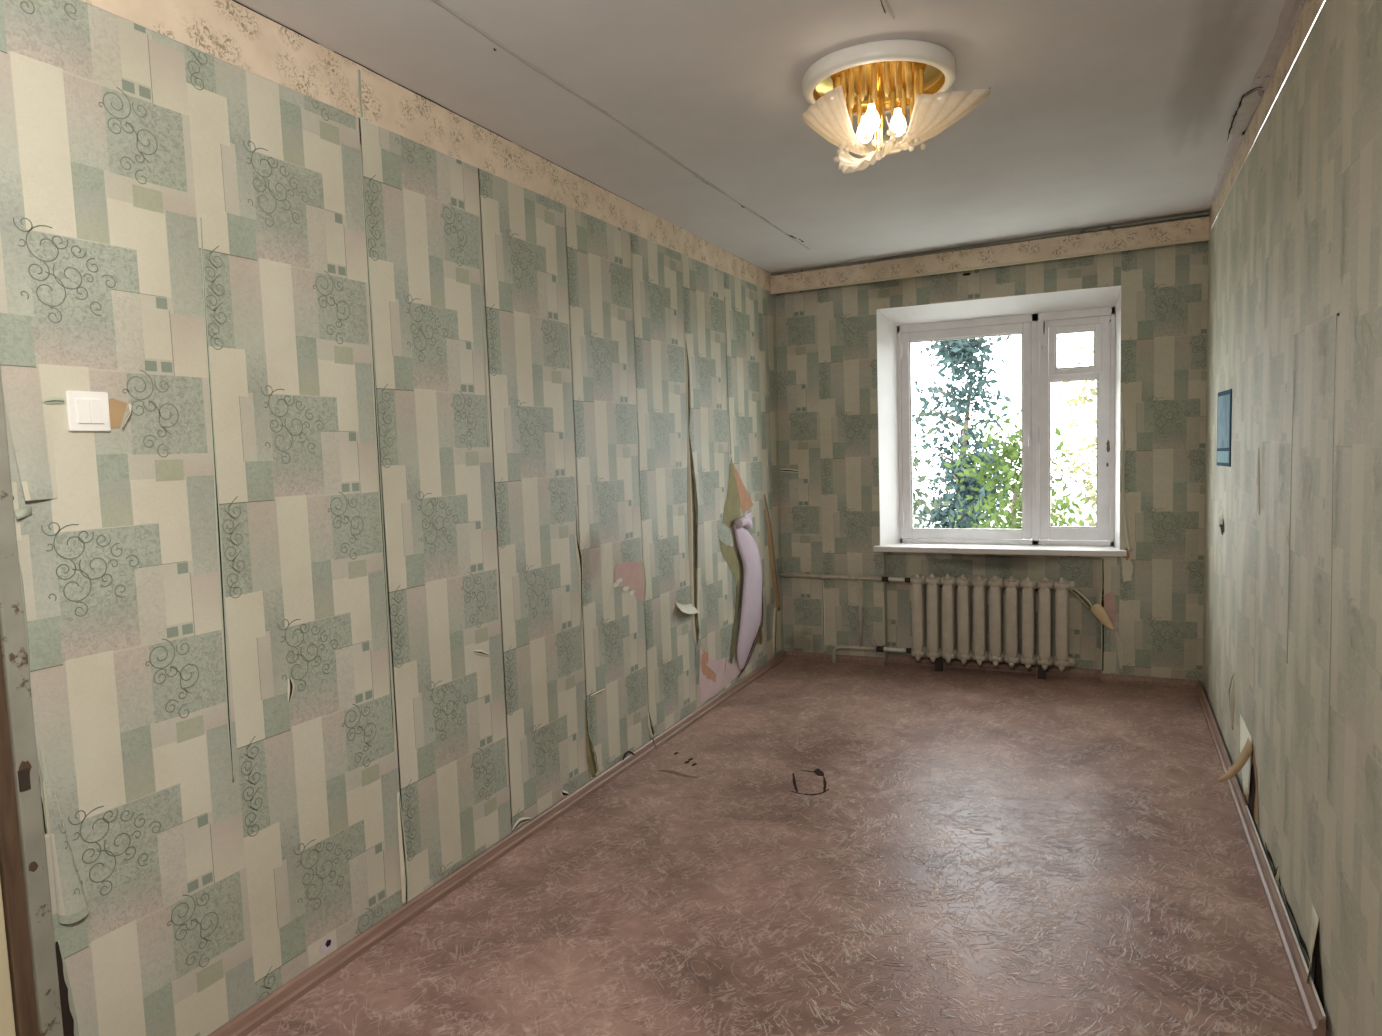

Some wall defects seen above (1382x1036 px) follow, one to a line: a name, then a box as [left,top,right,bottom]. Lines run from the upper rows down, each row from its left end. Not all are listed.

crack [880,0,895,19]
peeling [0,353,58,519]
flaking render [733,466,753,515]
peeling [19,745,89,924]
peeling [55,941,79,1036]